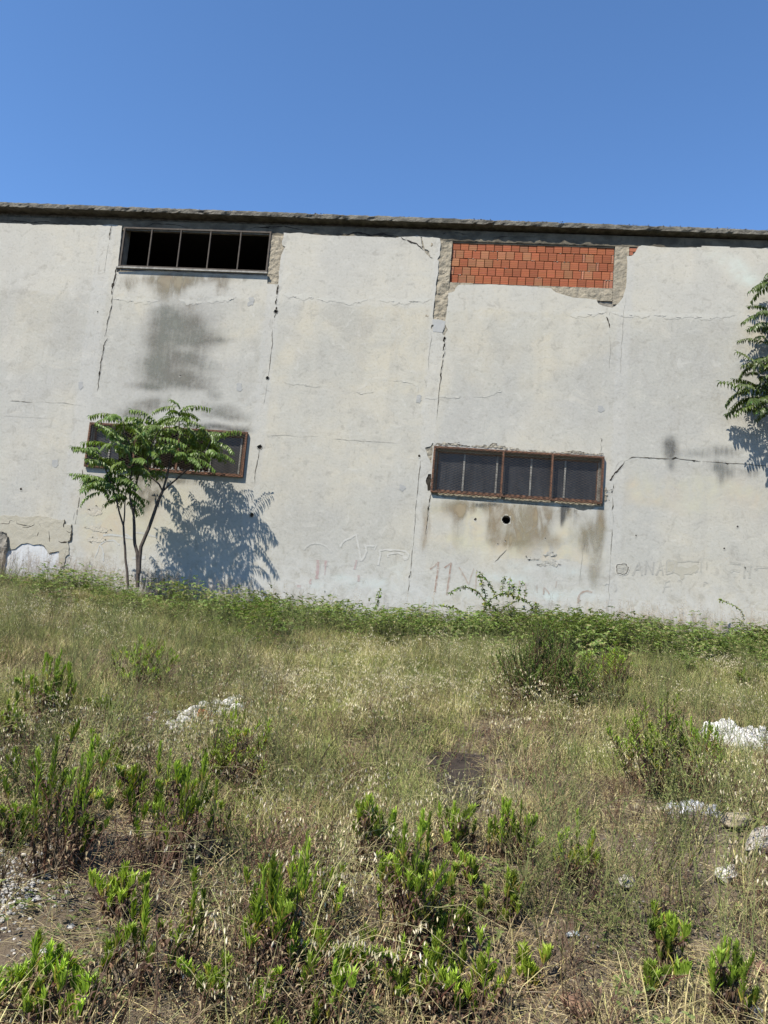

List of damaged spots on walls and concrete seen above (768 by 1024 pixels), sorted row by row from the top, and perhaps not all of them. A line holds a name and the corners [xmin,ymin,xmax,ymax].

crack [1,220,117,390]
water stain [150,275,224,294]
spalling [420,233,499,336]
spalling [516,239,638,304]
crack [425,336,446,411]
flaking render [0,515,72,577]
water stain [294,495,625,615]
crack [570,440,764,606]